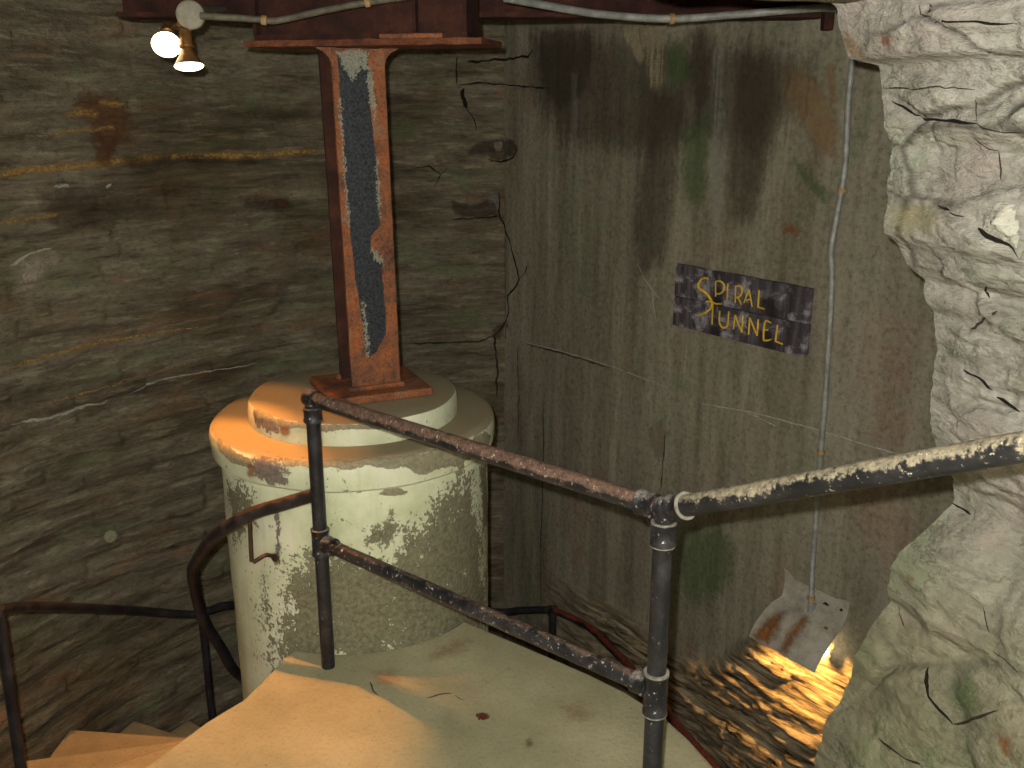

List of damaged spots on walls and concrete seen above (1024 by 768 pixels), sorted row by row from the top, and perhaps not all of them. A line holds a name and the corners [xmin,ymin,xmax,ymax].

damp [623,23,666,87]
crack [919,6,1017,25]
crack [887,86,1020,180]
crack [970,286,997,330]
peeling [253,408,306,435]
crack [409,192,668,604]
crack [963,370,1020,412]
peeling [217,438,309,551]
peeling [323,448,488,606]
peeling [251,545,321,673]
peeling [329,556,487,655]
crack [924,667,998,725]